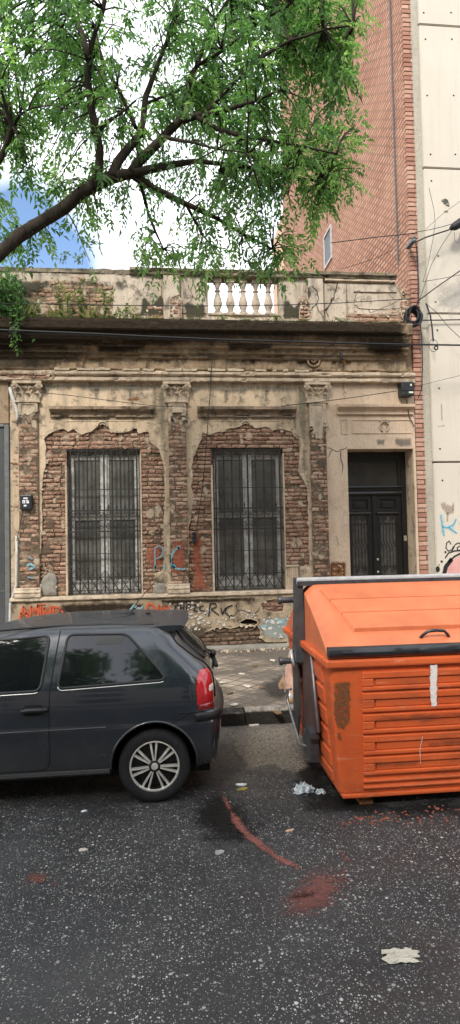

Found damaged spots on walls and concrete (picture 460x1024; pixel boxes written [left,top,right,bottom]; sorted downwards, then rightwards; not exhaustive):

flaking render [18,275,114,318]
flaking render [10,409,344,646]